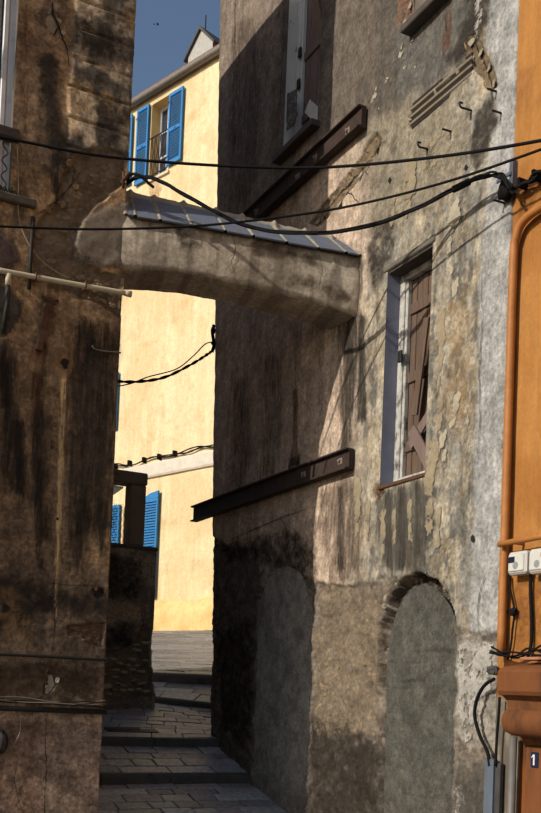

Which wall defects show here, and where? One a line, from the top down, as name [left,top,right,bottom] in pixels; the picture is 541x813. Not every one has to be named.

crack [45,2,70,66]
water stain [77,16,125,65]
spalling [408,0,498,129]
spalling [309,131,382,227]
water stain [338,311,366,449]
water stain [0,284,141,633]
water stain [216,529,316,576]
water stain [321,480,359,577]
peeling [353,477,396,558]
peeling [424,391,471,548]
spalling [45,674,60,694]